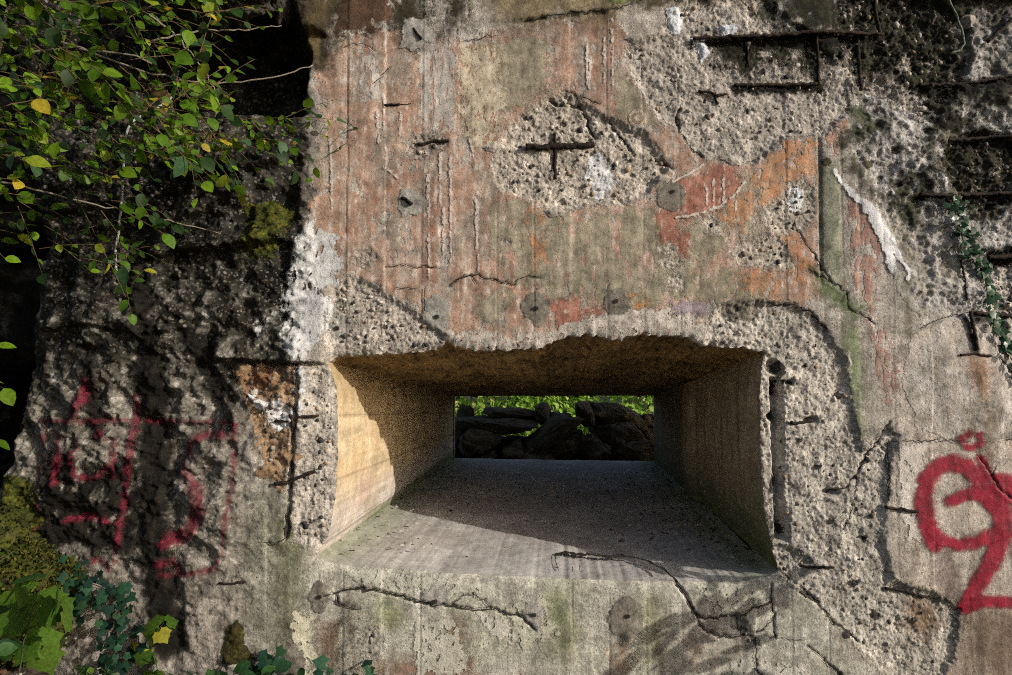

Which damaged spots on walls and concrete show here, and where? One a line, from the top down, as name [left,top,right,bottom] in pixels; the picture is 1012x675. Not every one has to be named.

corrosion [693,0,885,105]
corrosion [526,132,595,179]
water stain [689,0,1012,281]
spalling [933,129,1012,220]
efflorescence [248,217,344,431]
spalling [233,0,978,675]
corrosion [960,260,1012,357]
spalling [979,248,1012,329]
water stain [37,249,187,661]
crack [826,423,1012,530]
crack [323,586,535,630]
crack [555,551,858,675]